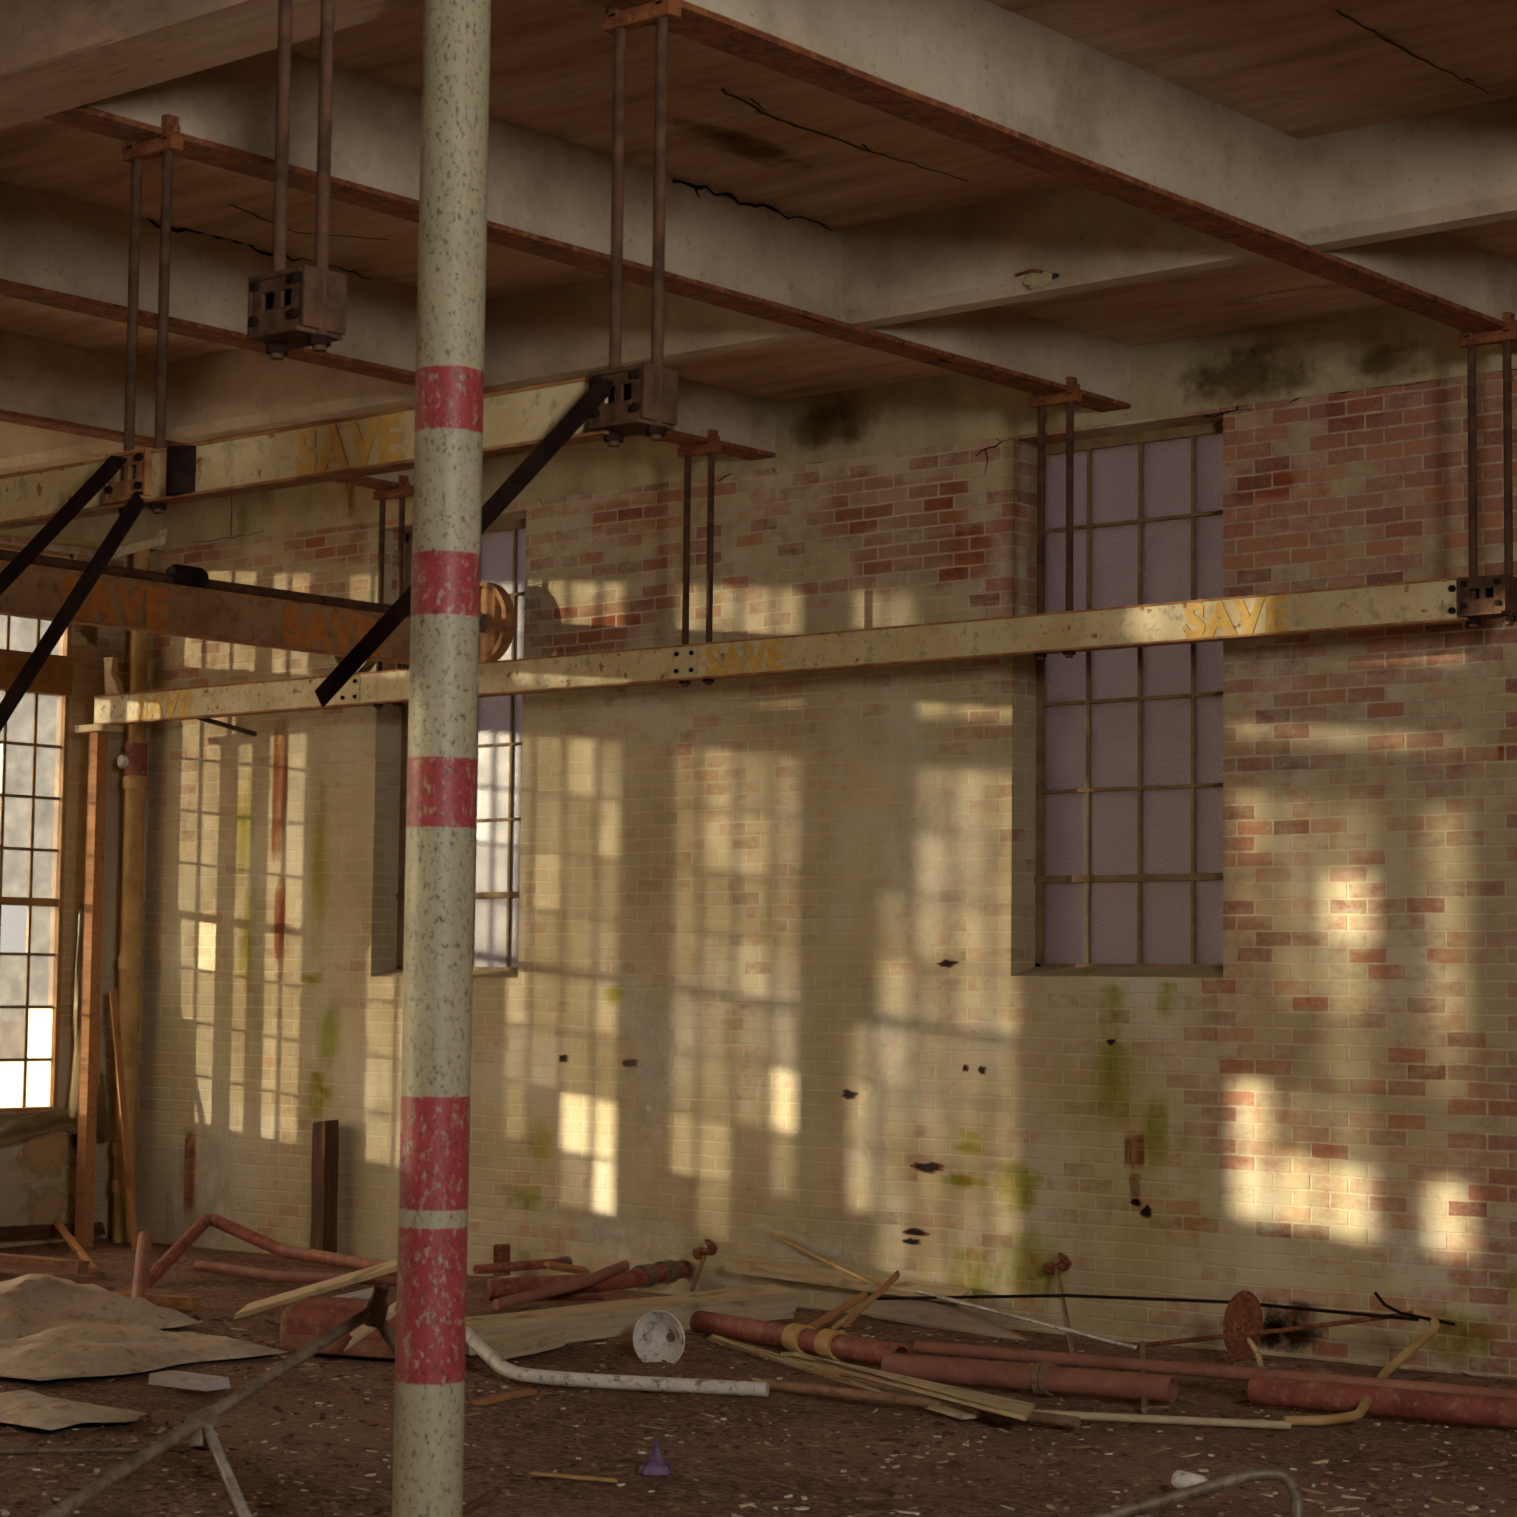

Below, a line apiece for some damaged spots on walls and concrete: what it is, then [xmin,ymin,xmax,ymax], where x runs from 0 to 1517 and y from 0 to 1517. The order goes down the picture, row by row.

crack [1335,10,1488,93]
crack [721,89,968,181]
crack [673,179,834,232]